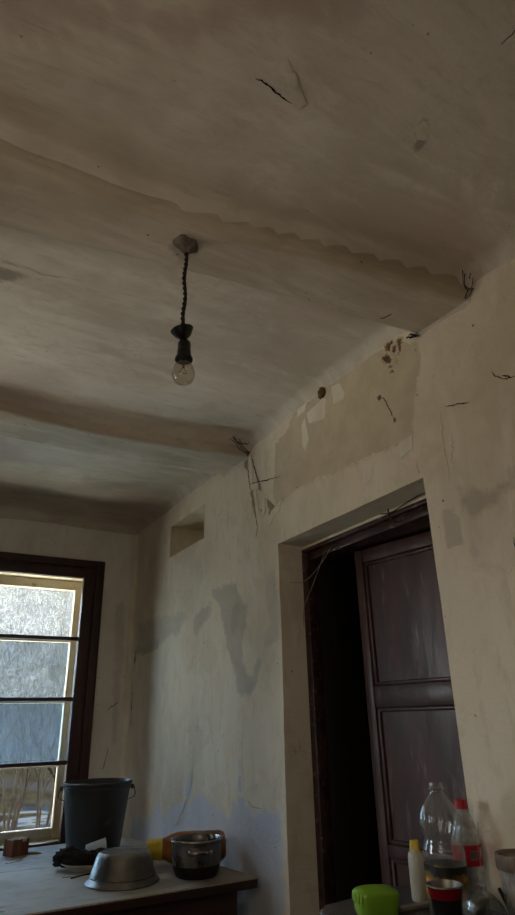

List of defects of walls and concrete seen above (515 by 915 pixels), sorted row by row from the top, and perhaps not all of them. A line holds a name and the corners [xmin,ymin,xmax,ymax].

peeling [243,336,425,520]
crack [376,393,397,424]